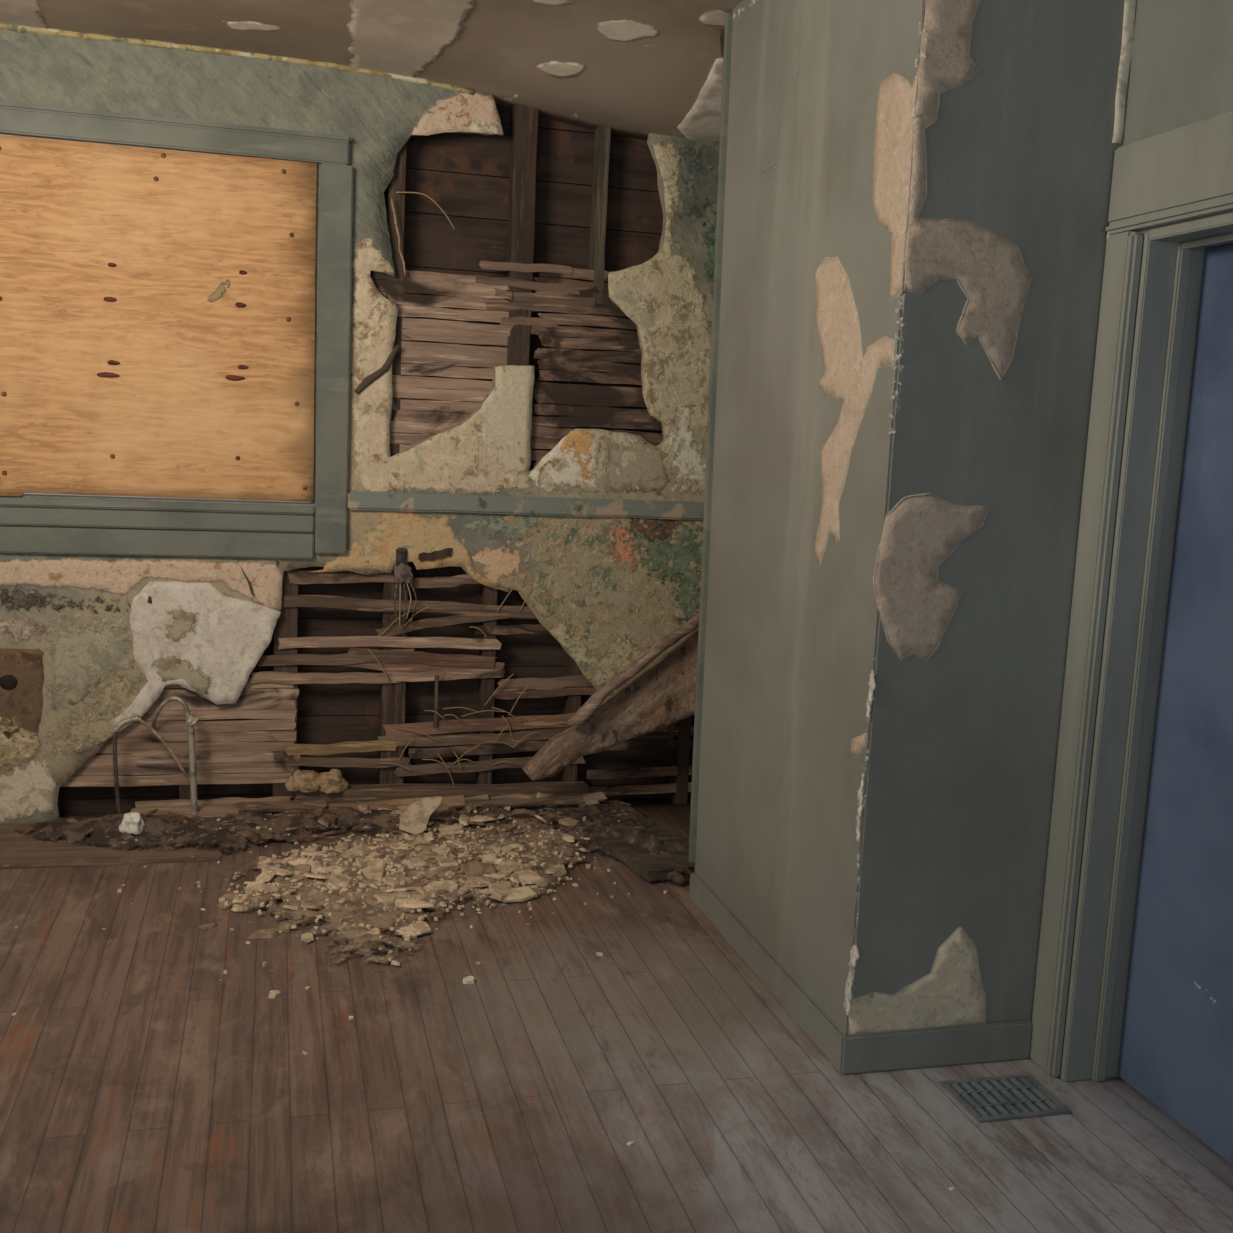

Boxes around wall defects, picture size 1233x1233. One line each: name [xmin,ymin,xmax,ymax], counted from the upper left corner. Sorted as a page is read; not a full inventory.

spalling [350,92,717,495]
peeling [813,0,1032,566]
spalling [0,514,704,823]
spalling [849,670,876,896]
peeling [873,493,989,661]
peeling [843,913,986,1034]